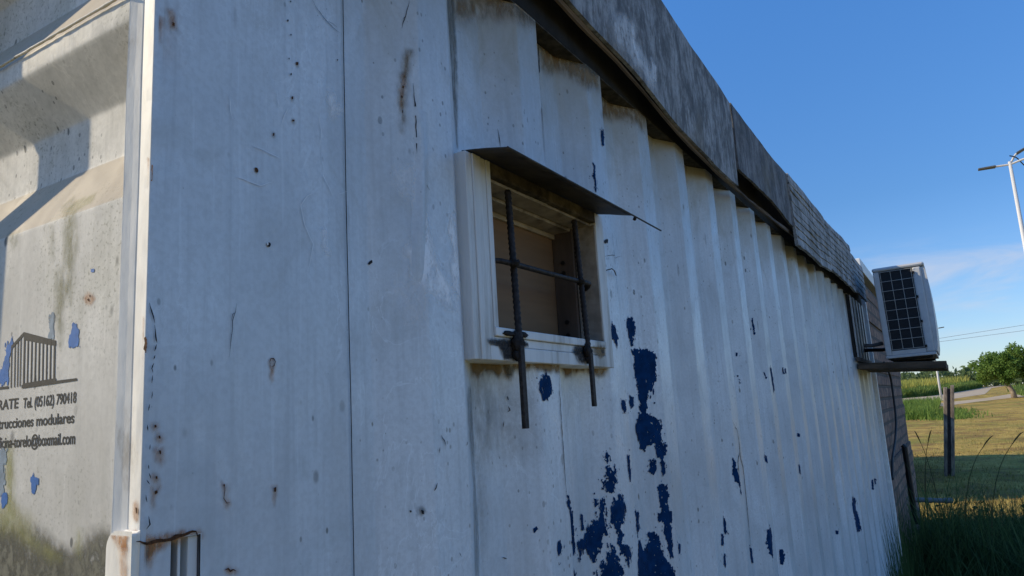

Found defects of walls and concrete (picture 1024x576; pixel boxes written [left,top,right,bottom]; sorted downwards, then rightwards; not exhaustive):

rust [400,56,409,113]
peeling [68,322,80,348]
peeling [536,372,554,401]
peeling [557,315,681,576]
peeling [30,473,39,494]
peeling [732,458,742,495]
peeling [852,496,862,532]
rust [112,530,198,561]